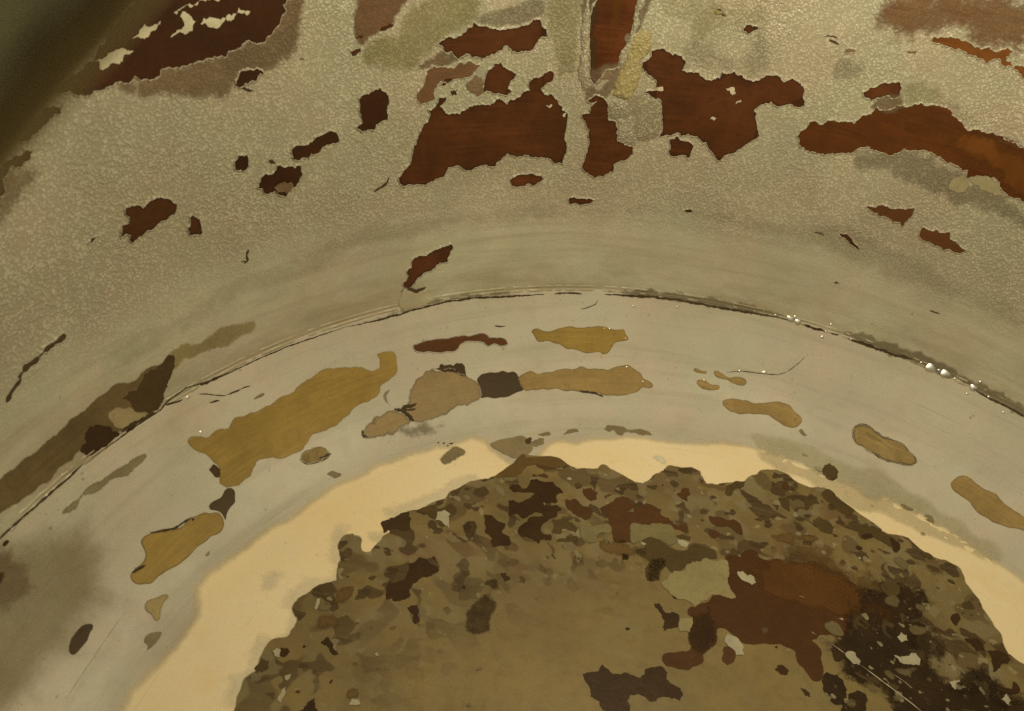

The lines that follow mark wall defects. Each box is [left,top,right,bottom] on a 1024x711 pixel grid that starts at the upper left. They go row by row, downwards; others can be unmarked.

peeling [73,0,288,99]
peeling [397,0,645,189]
peeling [641,46,806,162]
peeling [795,79,1024,203]
peeling [119,194,203,245]
peeling [399,242,455,312]
peeling [361,332,653,439]
peeling [532,326,629,354]
peeling [131,351,397,584]
peeling [852,424,917,466]
peeling [484,432,1024,711]